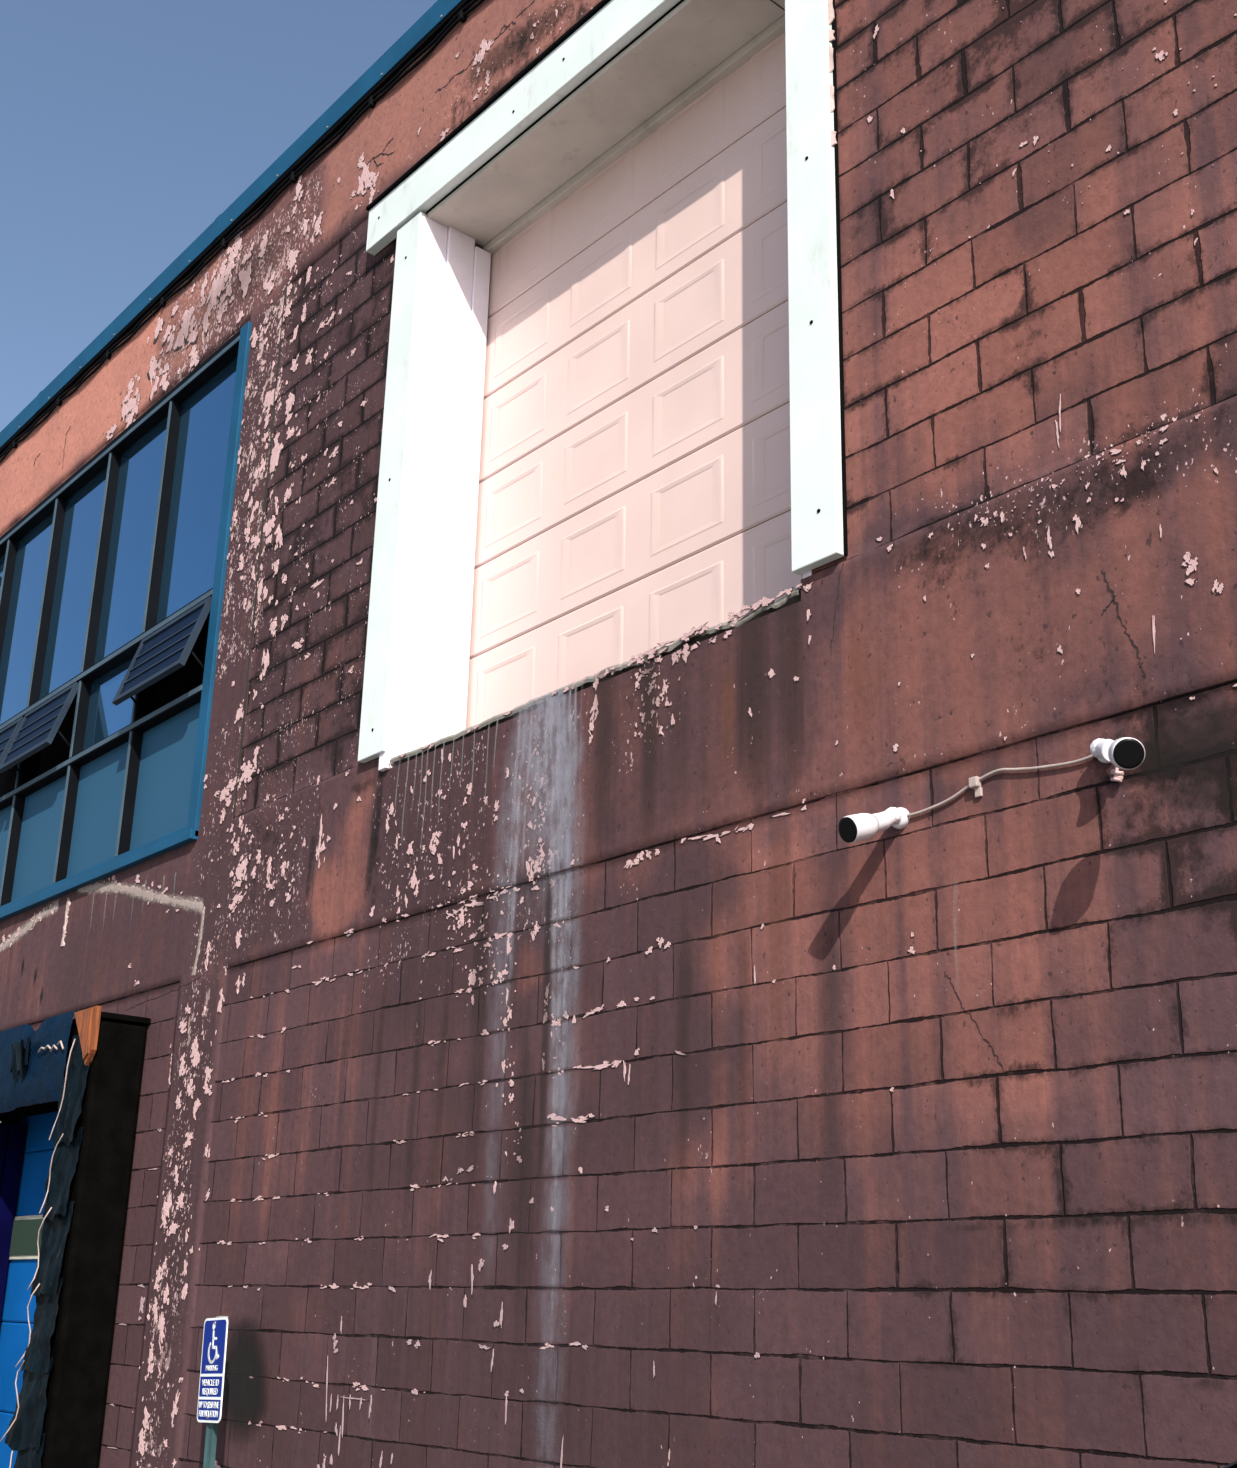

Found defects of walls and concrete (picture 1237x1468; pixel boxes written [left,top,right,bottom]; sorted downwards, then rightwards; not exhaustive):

crack [435,0,535,93]
peeling [106,174,352,733]
peeling [974,425,1169,569]
crack [1101,570,1146,678]
peeling [1182,552,1225,594]
peeling [82,745,338,949]
spalling [369,582,813,1164]
peeling [119,973,290,1468]
spalling [320,1282,396,1292]
spalling [410,1165,497,1194]
peeling [463,1259,484,1309]
peeling [277,1316,384,1468]